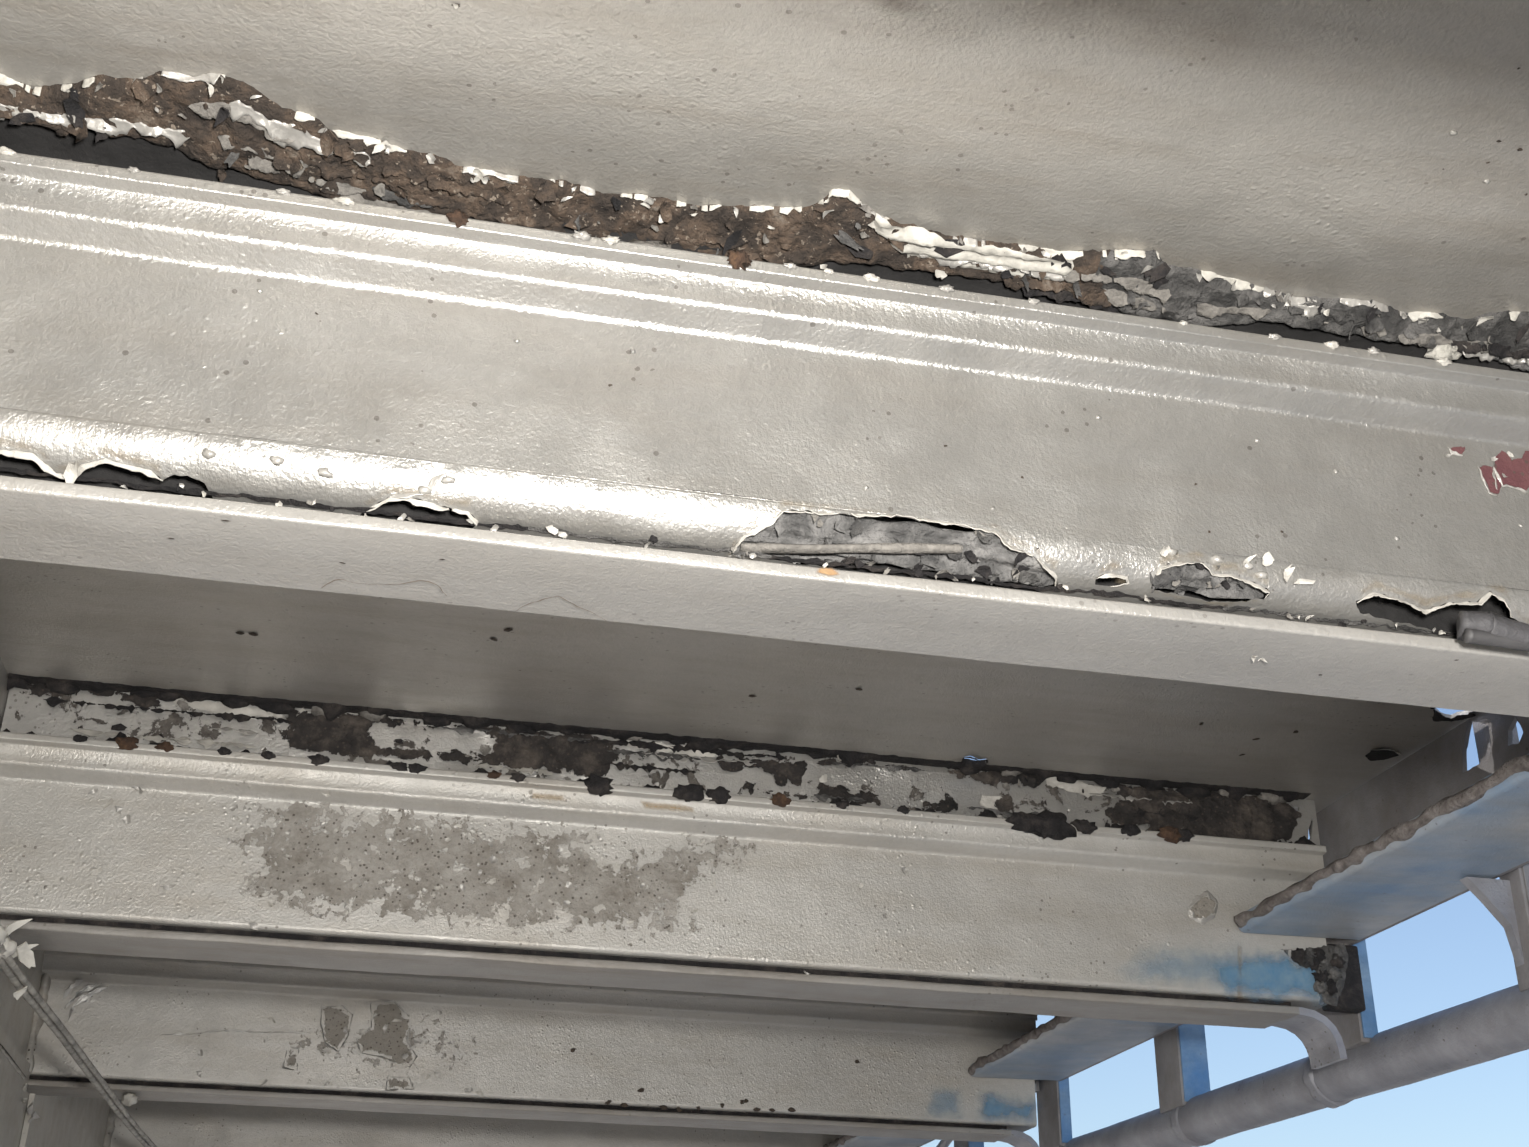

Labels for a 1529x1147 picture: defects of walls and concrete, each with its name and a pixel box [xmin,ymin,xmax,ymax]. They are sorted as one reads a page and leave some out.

rust [0,103,190,149]
rust [188,100,555,229]
rust [647,230,814,271]
rust [919,254,1171,314]
rust [1196,295,1529,371]
spalling [0,454,213,499]
spalling [360,473,499,531]
spalling [684,489,975,532]
spalling [730,545,1069,592]
spalling [1143,552,1316,611]
spalling [1338,582,1529,635]
rust [15,682,1302,844]